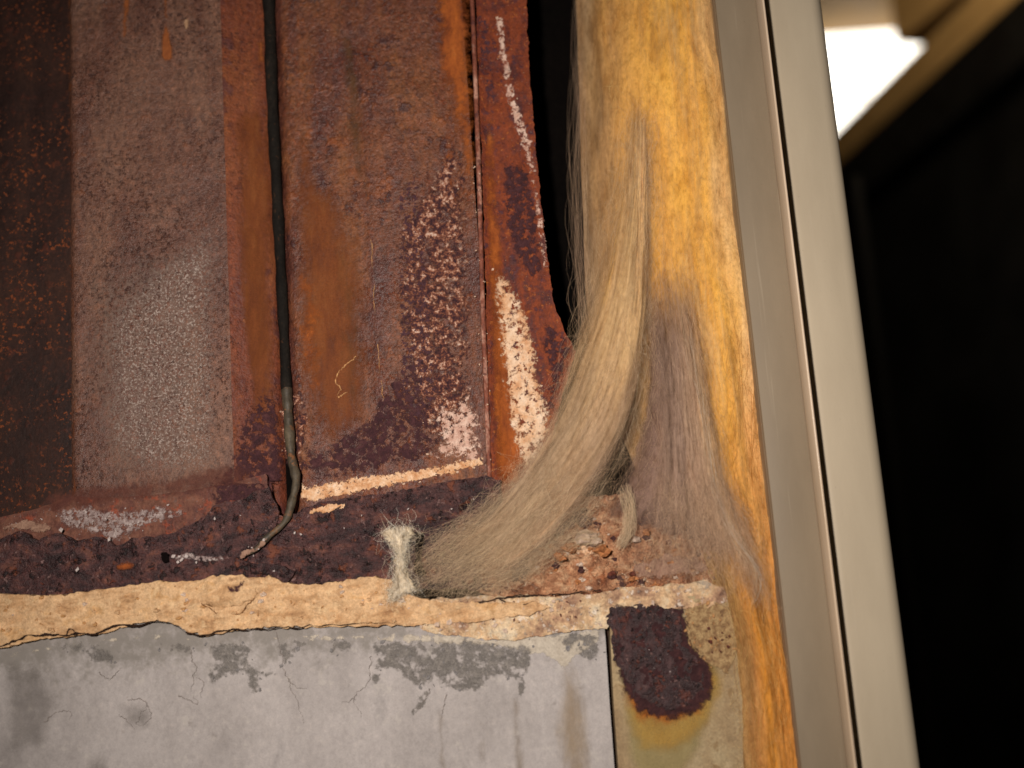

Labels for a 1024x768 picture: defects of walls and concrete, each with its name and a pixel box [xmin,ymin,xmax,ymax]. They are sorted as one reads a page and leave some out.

corrosion [436,0,495,174]
corrosion [300,176,436,479]
corrosion [487,136,541,485]
corrosion [543,327,570,407]
corrosion [211,395,284,504]
crack [0,621,390,723]
corrosion [597,604,716,768]